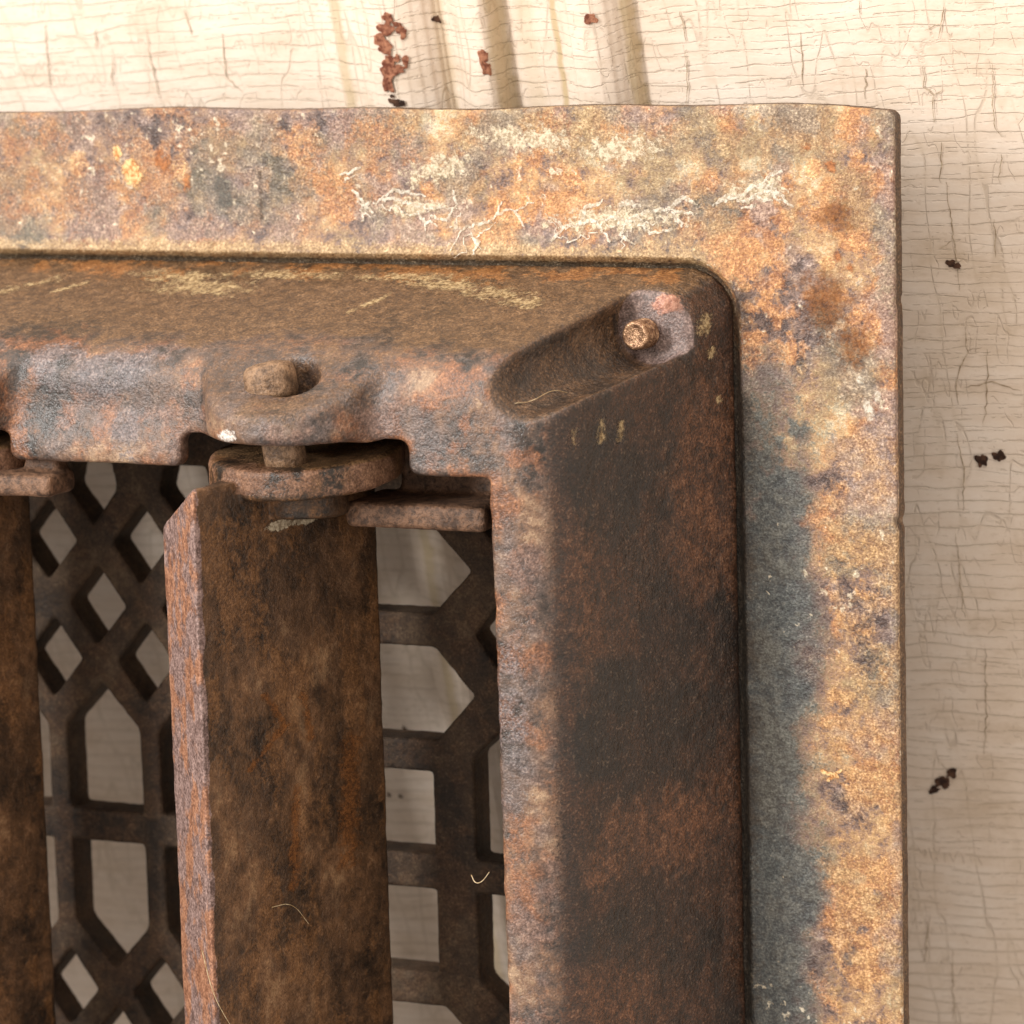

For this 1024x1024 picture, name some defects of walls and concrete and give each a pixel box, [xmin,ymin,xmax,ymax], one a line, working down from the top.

crack [146,29,167,103]
crack [222,33,240,90]
crack [679,13,689,102]
crack [794,32,804,87]
crack [992,64,1002,182]
rust [113,146,143,188]
crack [922,67,960,290]
crack [956,328,1020,424]
crack [957,435,965,510]
crack [982,651,990,745]
rust [821,769,842,782]